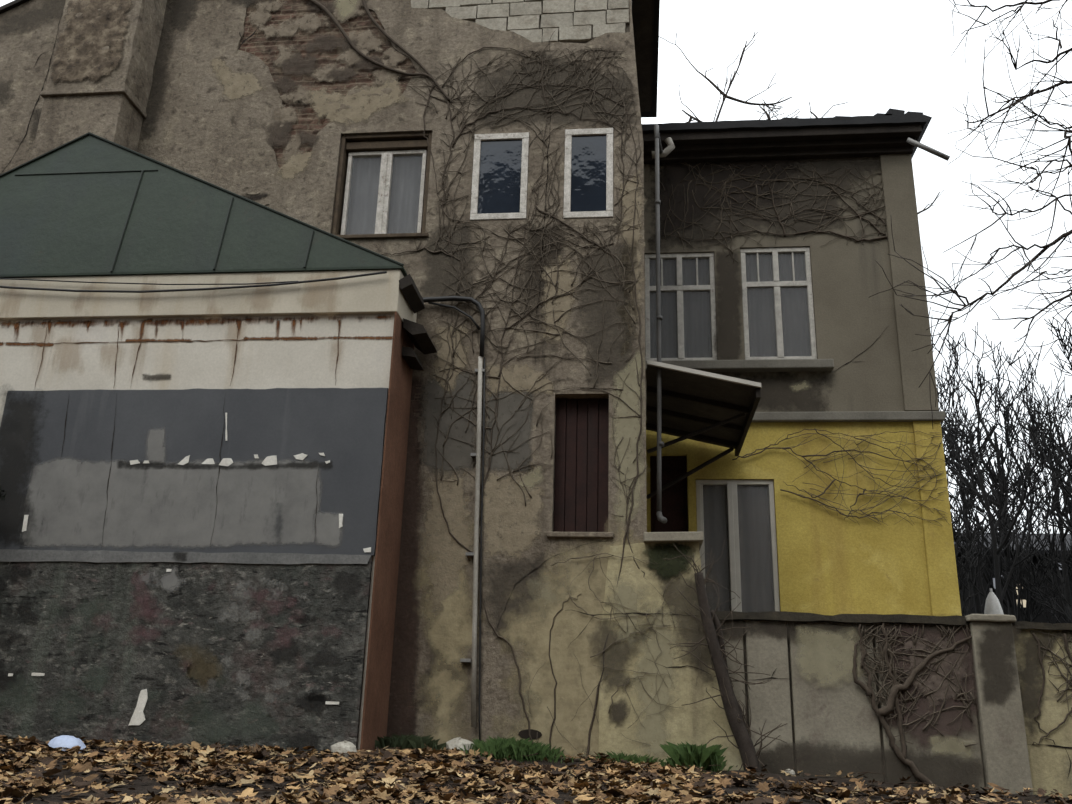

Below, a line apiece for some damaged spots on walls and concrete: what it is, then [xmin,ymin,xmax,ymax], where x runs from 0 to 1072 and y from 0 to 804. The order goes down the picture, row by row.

flaking render [211,0,416,180]
corrosion [0,317,393,347]
peeling [22,428,343,548]
peeling [129,689,148,725]
leakage [593,620,645,687]
leakage [656,574,1072,790]